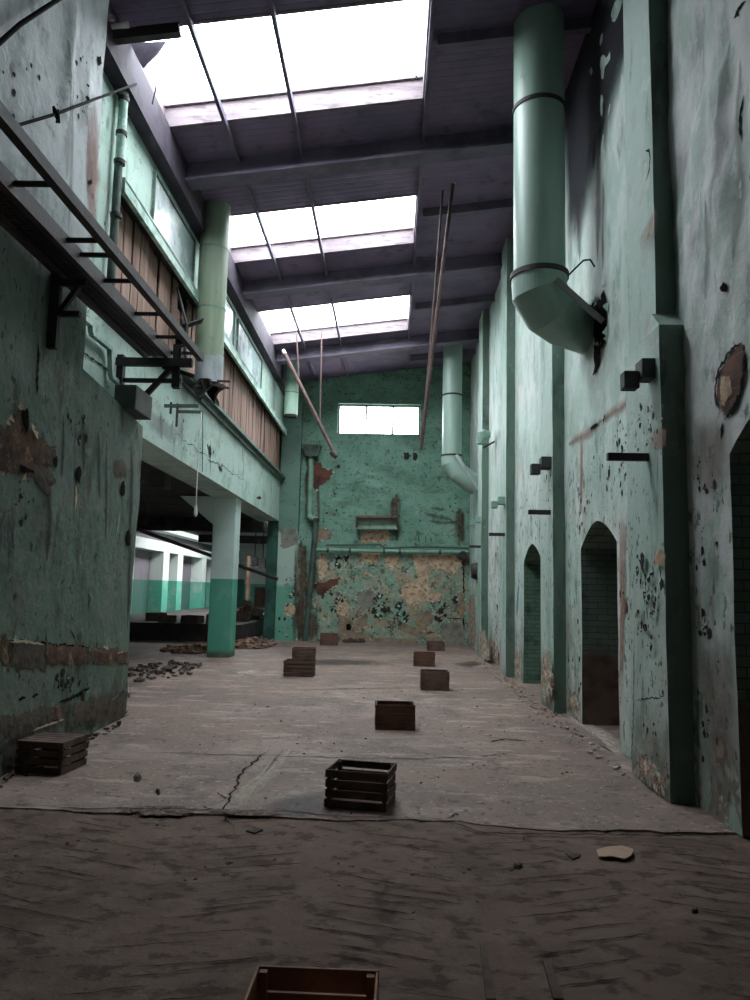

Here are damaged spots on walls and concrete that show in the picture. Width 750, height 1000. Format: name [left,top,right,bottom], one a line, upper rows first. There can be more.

flaking render [714,343,747,418]
spalling [0,403,58,505]
flaking render [313,462,335,491]
flaking render [360,530,400,570]
flaking render [314,554,500,666]
spalling [0,633,131,769]
crack [398,739,525,759]
crack [38,751,373,829]